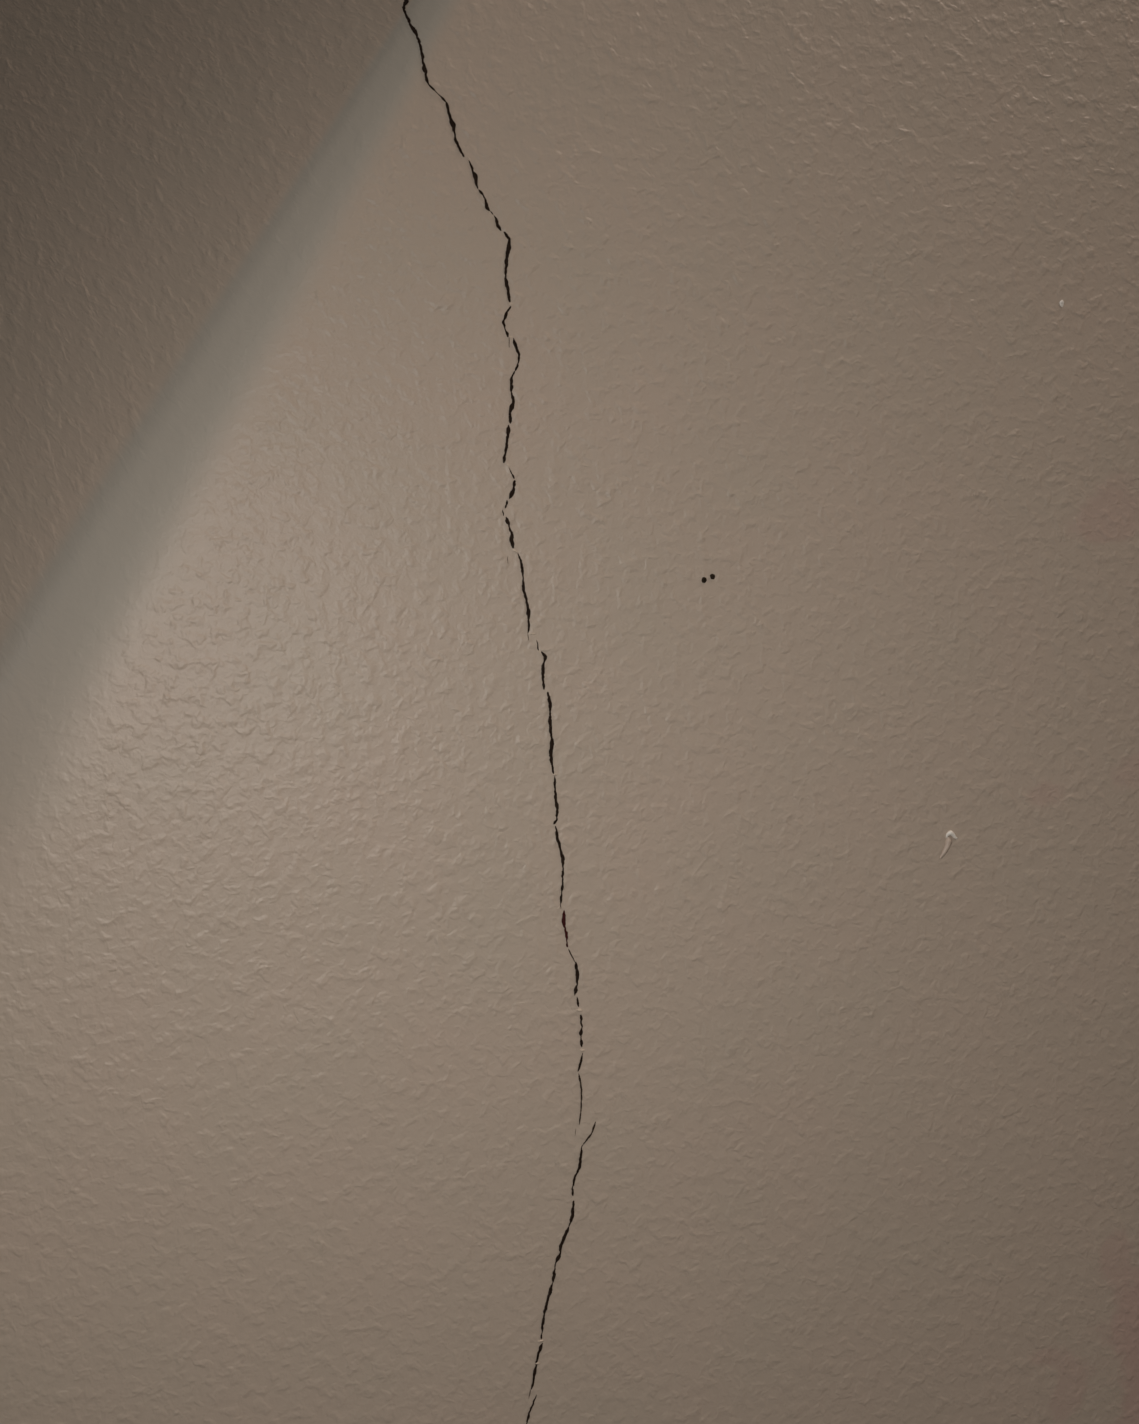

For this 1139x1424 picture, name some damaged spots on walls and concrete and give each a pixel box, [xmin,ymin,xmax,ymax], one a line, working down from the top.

crack [402,0,596,1424]